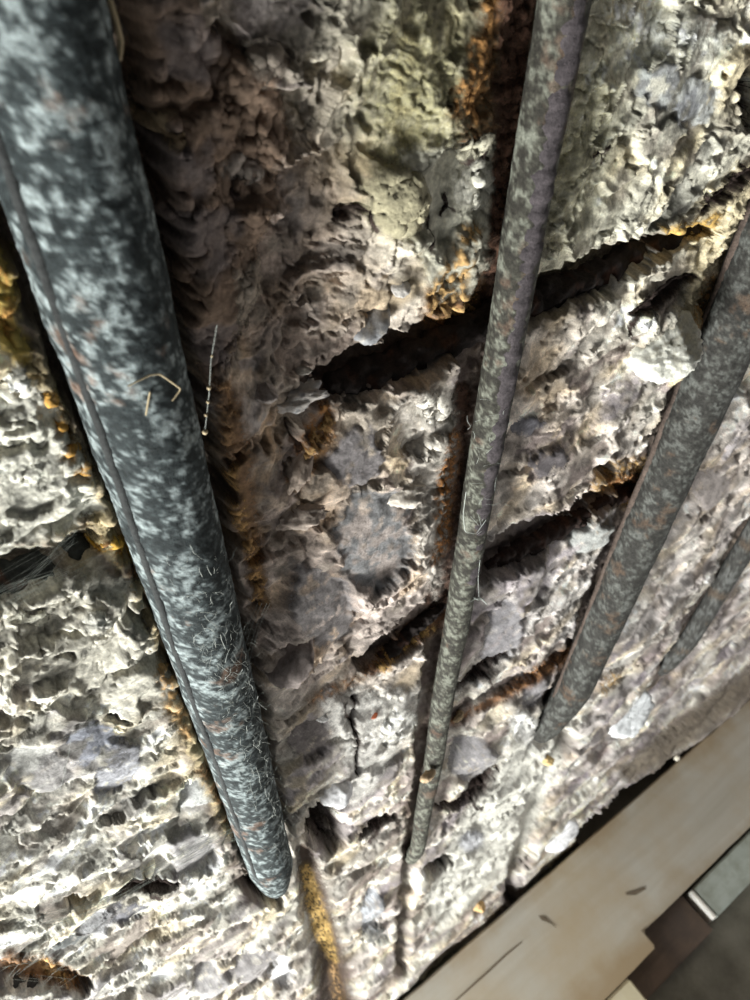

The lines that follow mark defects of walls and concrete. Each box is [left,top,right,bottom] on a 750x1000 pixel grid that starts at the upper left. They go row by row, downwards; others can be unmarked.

spalling [402,134,496,299]
rust [425,0,537,328]
rust [662,166,750,331]
spalling [0,364,102,555]
rust [0,245,233,836]
flaking render [286,386,457,648]
spalling [0,575,179,702]
crack [343,695,363,776]
spalling [287,688,421,807]
spalling [425,668,561,931]
rust [450,645,572,725]
rust [297,842,357,1000]